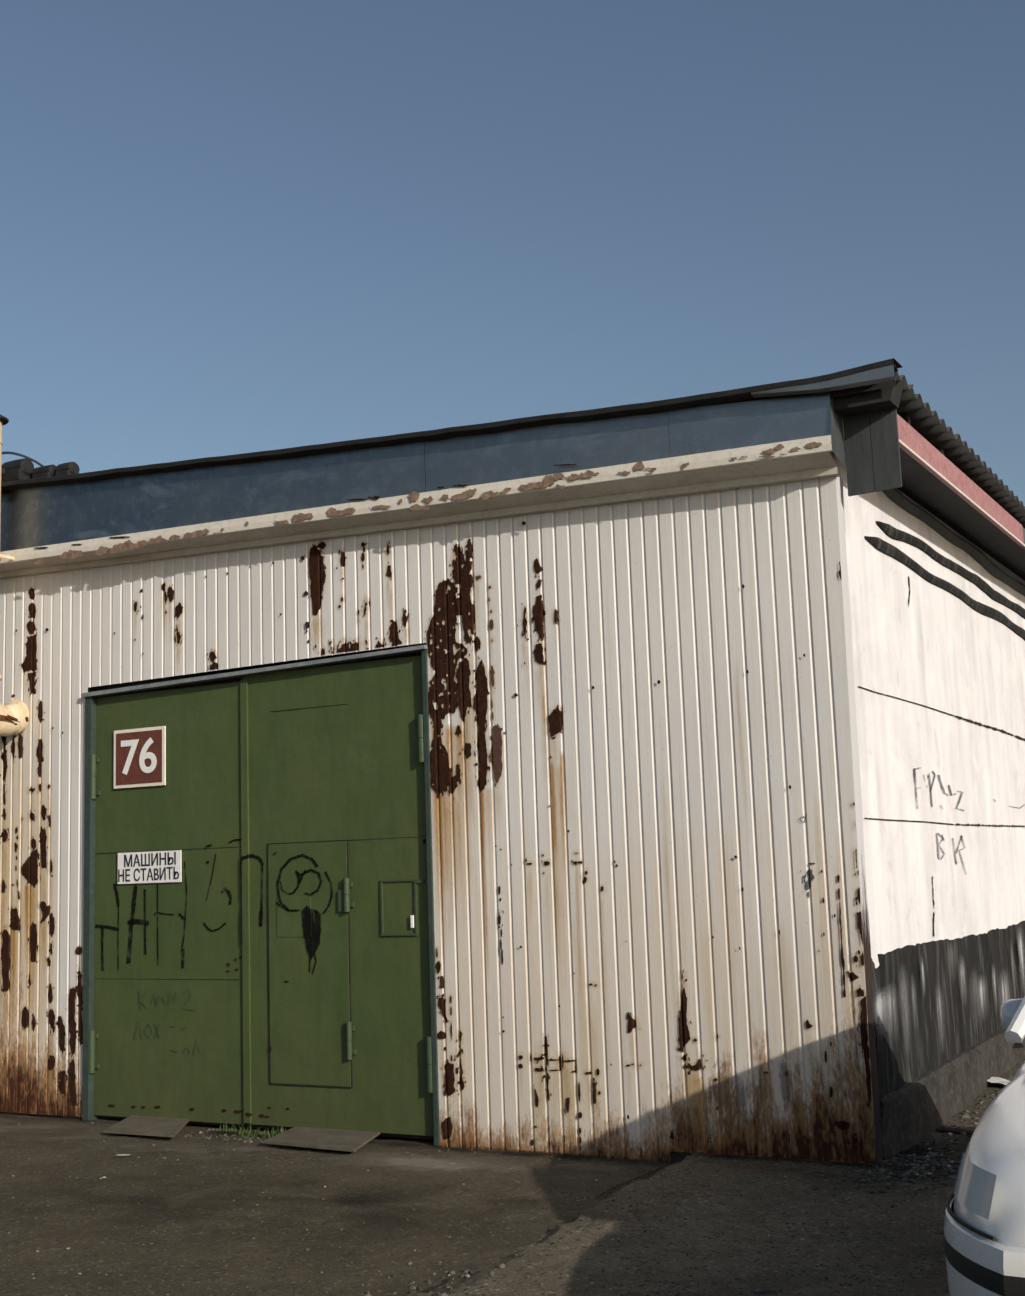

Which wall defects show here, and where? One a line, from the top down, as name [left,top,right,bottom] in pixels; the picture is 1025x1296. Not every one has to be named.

peeling [34,528,224,564]
peeling [274,507,356,525]
rust [299,541,409,655]
peeling [372,470,599,511]
rust [517,558,559,665]
peeling [618,461,656,475]
peeling [731,442,822,460]
rust [423,535,506,965]
rust [0,587,83,1117]
rust [435,948,466,1096]
rust [440,849,876,1164]
crack [419,1277,453,1293]